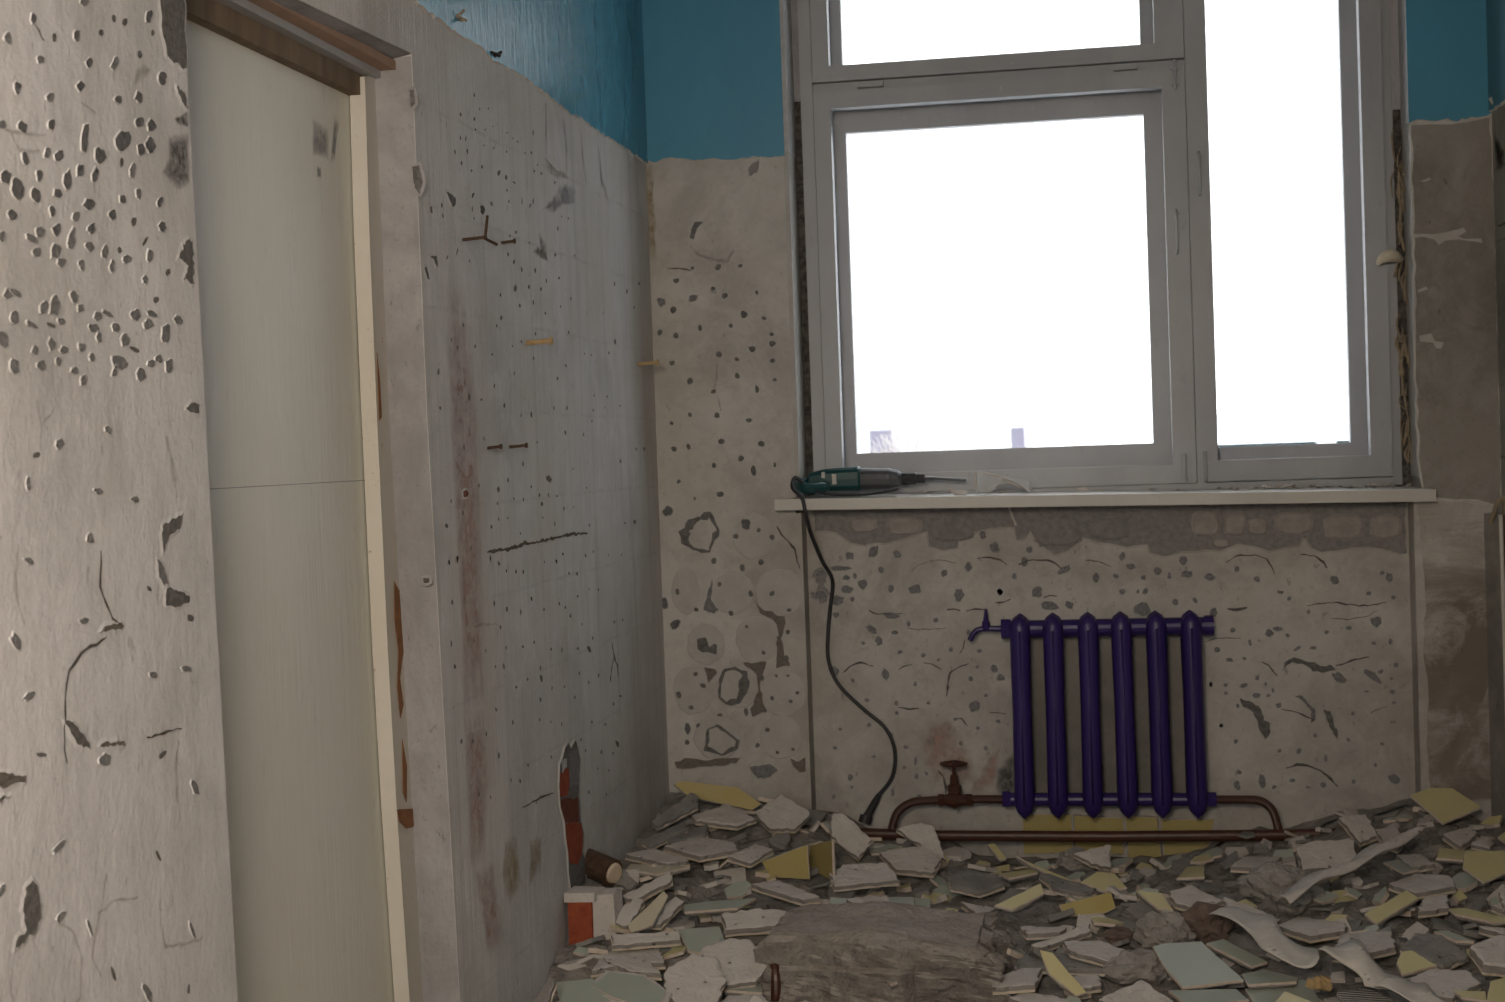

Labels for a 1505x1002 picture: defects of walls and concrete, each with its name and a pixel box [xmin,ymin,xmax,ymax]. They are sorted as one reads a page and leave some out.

crack [487,532,587,553]
spalling [809,489,1409,618]
spalling [0,875,66,954]
crack [64,550,121,763]
crack [147,728,181,738]
spalling [515,665,756,955]
spalling [662,491,808,811]
peeling [1063,637,1082,793]
spalling [987,814,1214,917]
peeling [1098,636,1117,793]
peeling [1132,635,1151,793]
peeling [1167,635,1186,793]